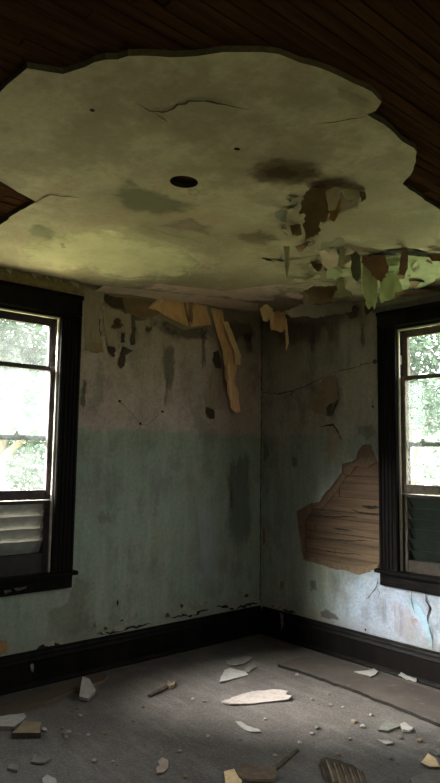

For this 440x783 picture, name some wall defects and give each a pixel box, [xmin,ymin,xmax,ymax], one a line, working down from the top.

crack [138,100,249,122]
leakage [120,182,208,235]
leakage [255,160,355,223]
peeling [360,255,440,313]
peeling [211,308,241,413]
crack [259,318,372,600]
spalling [297,444,380,575]
crack [411,594,433,649]